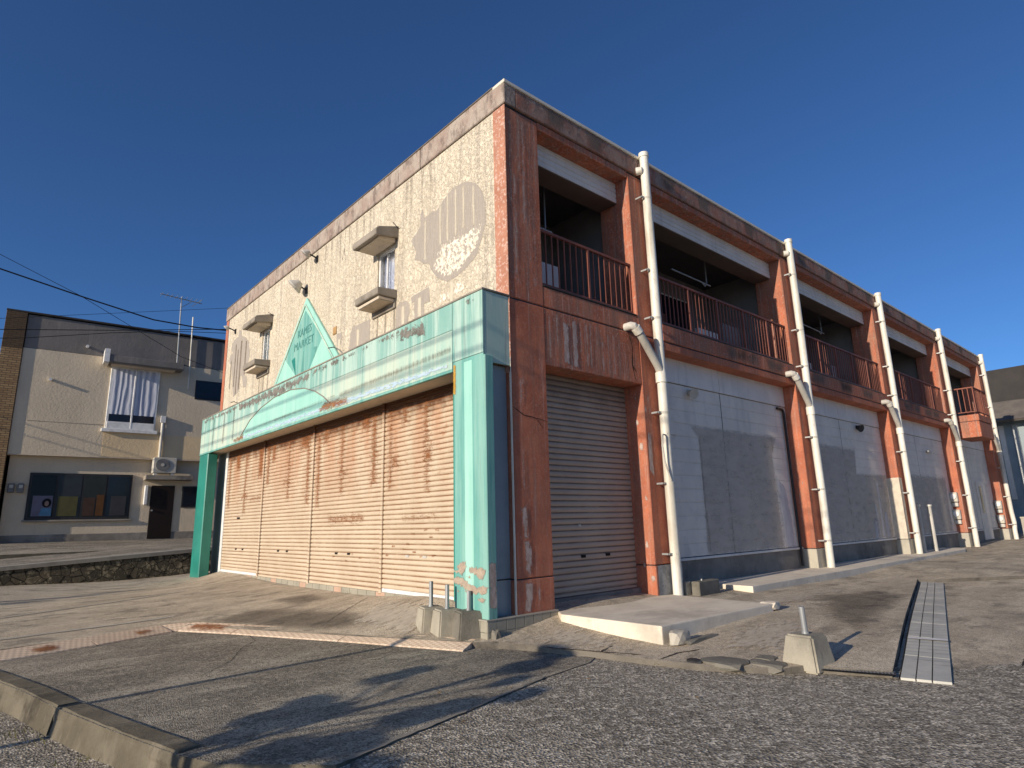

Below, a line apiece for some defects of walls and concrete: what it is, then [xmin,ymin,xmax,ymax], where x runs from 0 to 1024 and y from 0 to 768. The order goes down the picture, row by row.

peeling [205,181,486,423]
corrosion [320,399,346,412]
corrosion [227,445,276,513]
corrosion [287,428,329,504]
corrosion [363,401,409,489]
peeling [453,562,497,608]